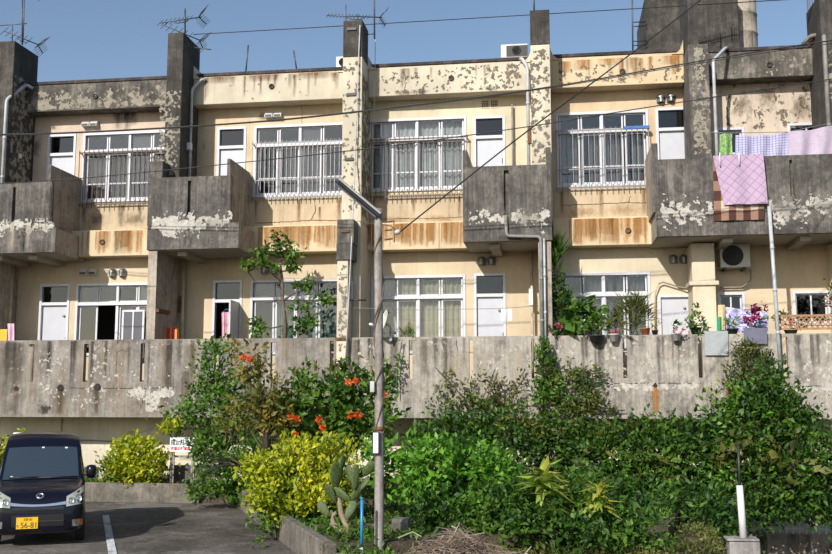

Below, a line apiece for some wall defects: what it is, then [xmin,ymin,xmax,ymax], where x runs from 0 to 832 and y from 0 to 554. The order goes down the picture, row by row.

spalling [379,49,661,163]
peeling [9,75,181,182]
spalling [342,61,370,223]
peeling [0,218,54,237]
corrosion [87,230,142,247]
peeling [151,210,233,239]
corrosion [258,225,335,243]
corrosion [368,222,463,240]
peeling [469,207,550,234]
corrosion [569,217,646,239]
peeling [660,193,714,231]
peeling [39,345,174,412]